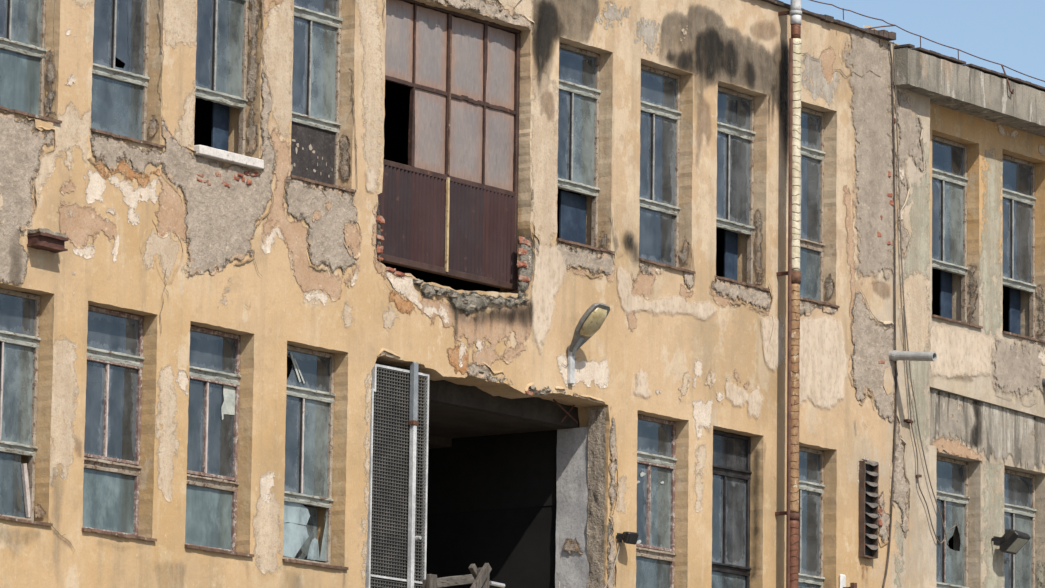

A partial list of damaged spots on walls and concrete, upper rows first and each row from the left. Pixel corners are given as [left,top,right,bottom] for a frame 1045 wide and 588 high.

leakage [533,0,599,80]
leakage [661,5,789,152]
flaking render [0,0,616,385]
flaking render [710,208,773,316]
peeling [800,25,930,547]
peeling [49,335,79,486]
peeling [155,365,190,502]
peeling [253,471,282,575]
peeling [525,354,629,588]